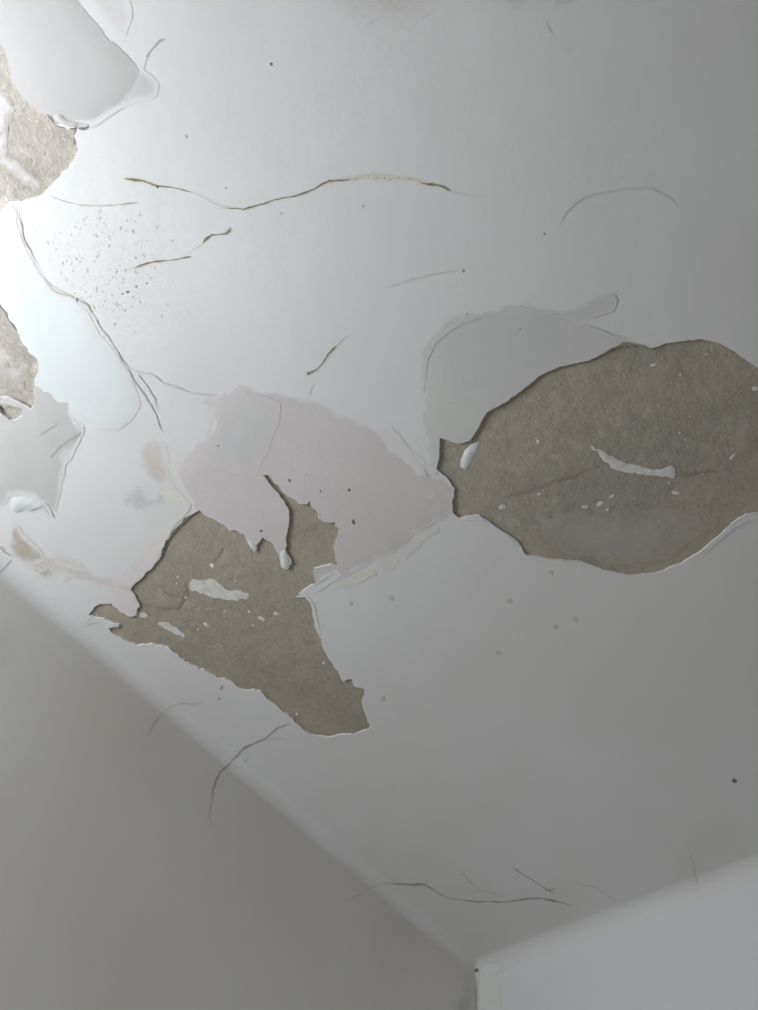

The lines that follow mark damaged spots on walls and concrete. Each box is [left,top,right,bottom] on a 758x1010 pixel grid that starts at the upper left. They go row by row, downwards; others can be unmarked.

spalling [0,44,88,211]
crack [51,171,483,295]
spalling [0,305,39,419]
crack [18,211,215,430]
spalling [437,339,758,575]
spalling [90,475,370,736]
crack [209,723,292,827]
crack [348,868,616,906]